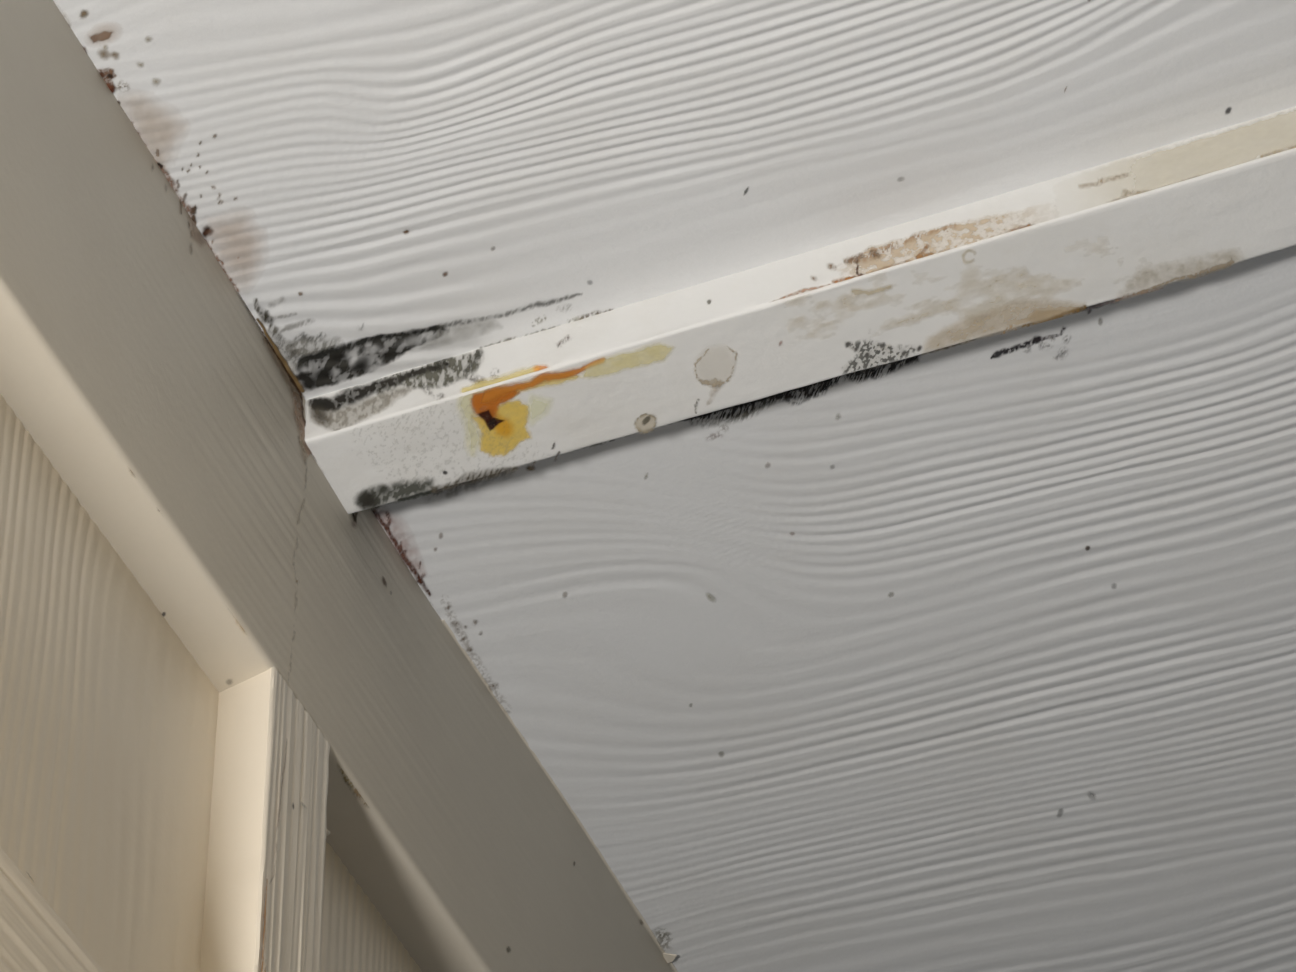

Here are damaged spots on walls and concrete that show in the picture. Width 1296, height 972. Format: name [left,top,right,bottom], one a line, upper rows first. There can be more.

damp [137,132,239,292]
damp [255,294,580,430]
corrosion [462,348,660,456]
damp [634,339,974,433]
damp [991,260,1234,359]
mould [352,462,536,523]